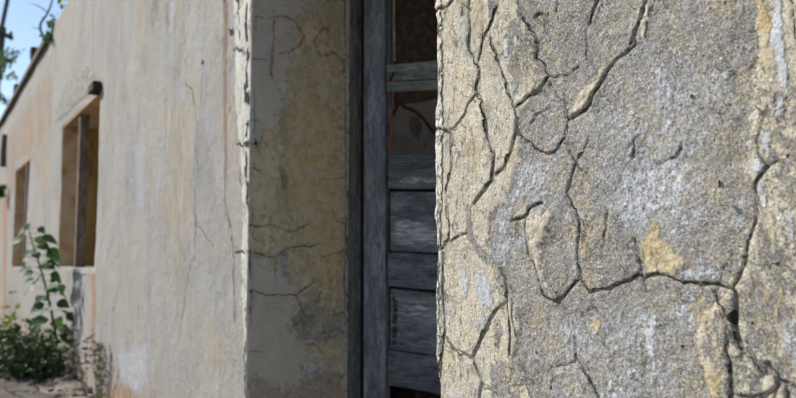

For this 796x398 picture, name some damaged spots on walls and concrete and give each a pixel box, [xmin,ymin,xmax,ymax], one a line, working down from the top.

peeling [233,0,290,398]
crack [225,0,349,396]
crack [437,0,796,398]
spalling [459,0,796,398]